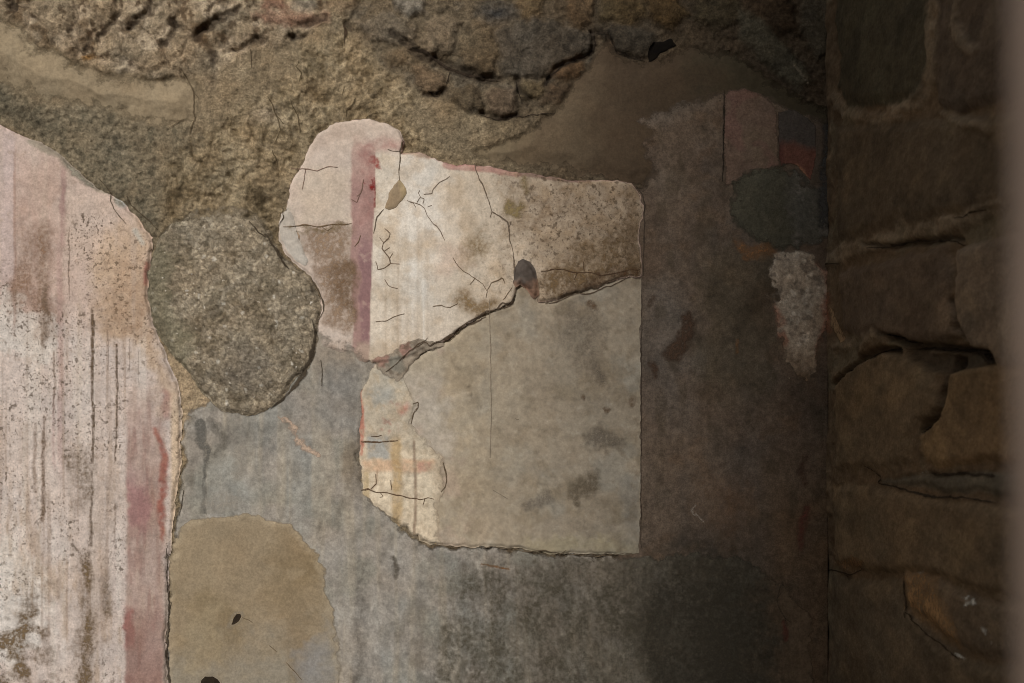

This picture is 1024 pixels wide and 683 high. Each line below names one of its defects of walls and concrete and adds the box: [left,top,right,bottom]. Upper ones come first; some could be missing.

spalling [385,180,407,210]
spalling [279,208,308,266]
crack [386,163,519,452]
crack [541,186,645,398]
spalling [769,250,846,381]
crack [361,402,418,443]
crack [362,463,447,504]